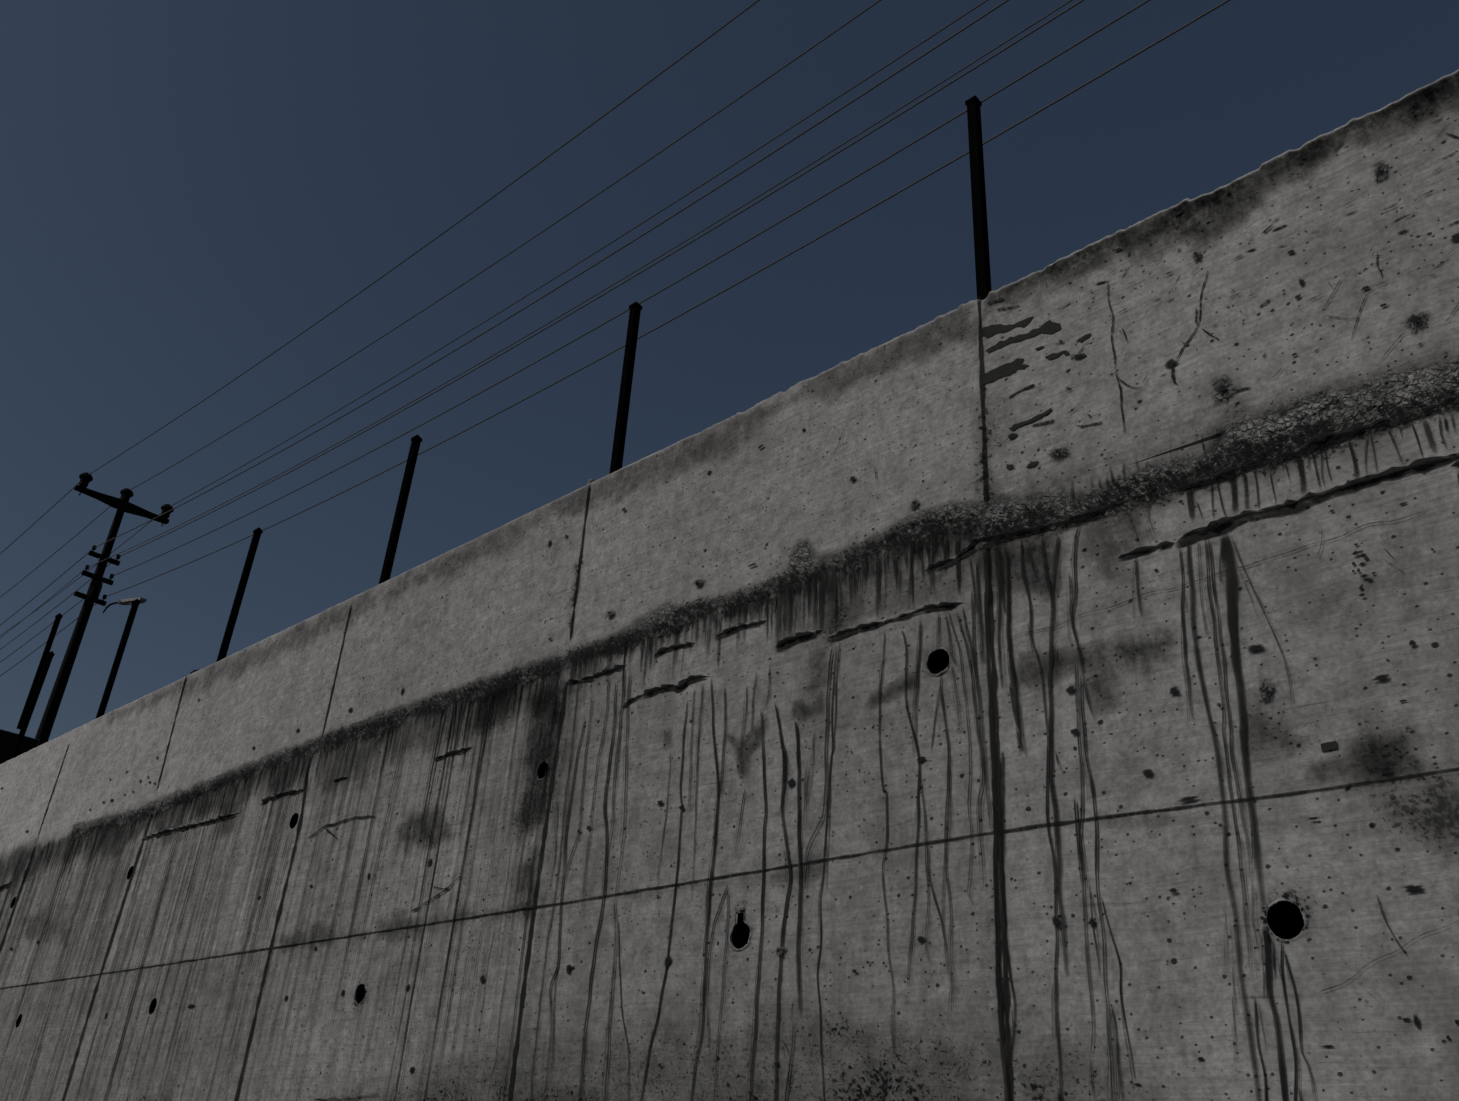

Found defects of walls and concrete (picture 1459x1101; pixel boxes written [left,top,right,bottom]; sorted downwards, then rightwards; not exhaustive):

crack [1107,271,1219,429]
leakage [0,402,1459,1101]